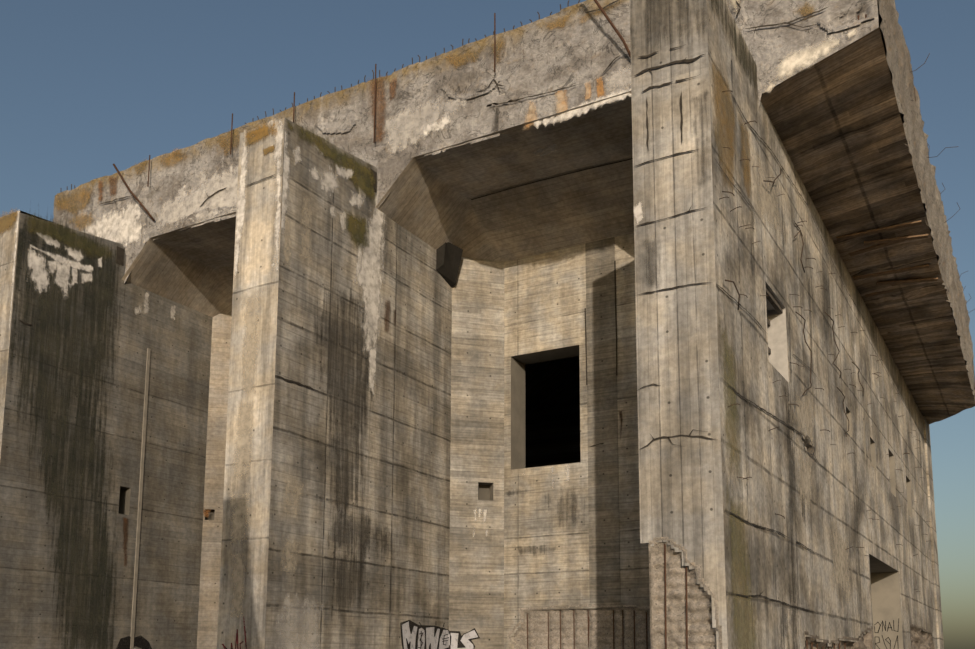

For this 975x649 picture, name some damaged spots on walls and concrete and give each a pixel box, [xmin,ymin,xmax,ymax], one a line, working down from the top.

leakage [645,0,757,89]
rust [371,79,397,140]
leakage [270,120,301,271]
leakage [311,165,353,192]
crack [477,44,866,322]
crack [638,282,767,333]
leakage [9,200,142,649]
leakage [316,187,391,614]
spalling [507,537,722,649]
spalling [804,626,873,649]
spalling [910,623,935,649]